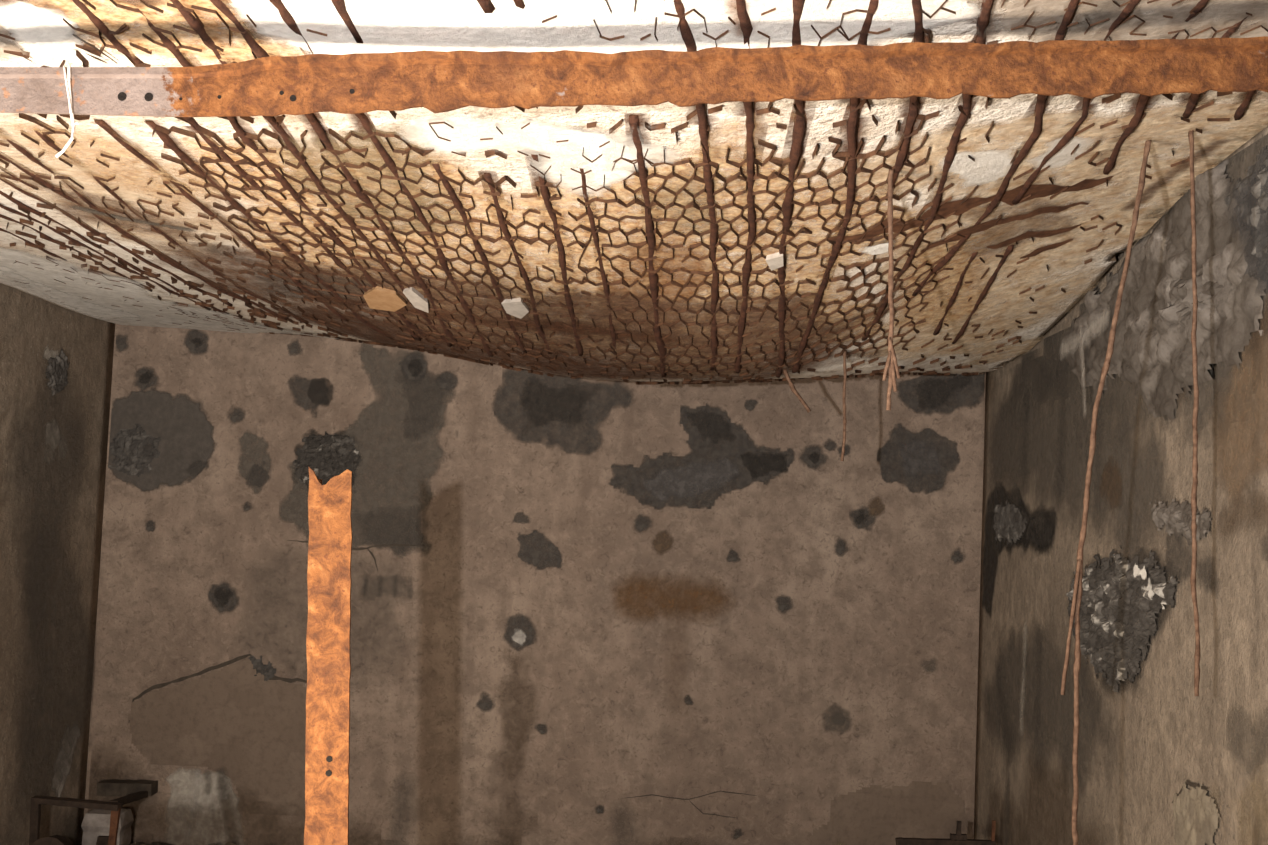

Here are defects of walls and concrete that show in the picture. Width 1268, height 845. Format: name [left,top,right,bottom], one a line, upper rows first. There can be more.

flaking render [0,0,78,52]
flaking render [232,0,977,55]
flaking render [412,117,664,192]
flaking render [0,248,342,340]
spalling [1061,146,1268,421]
spalling [293,430,362,490]
spalling [1066,499,1215,693]